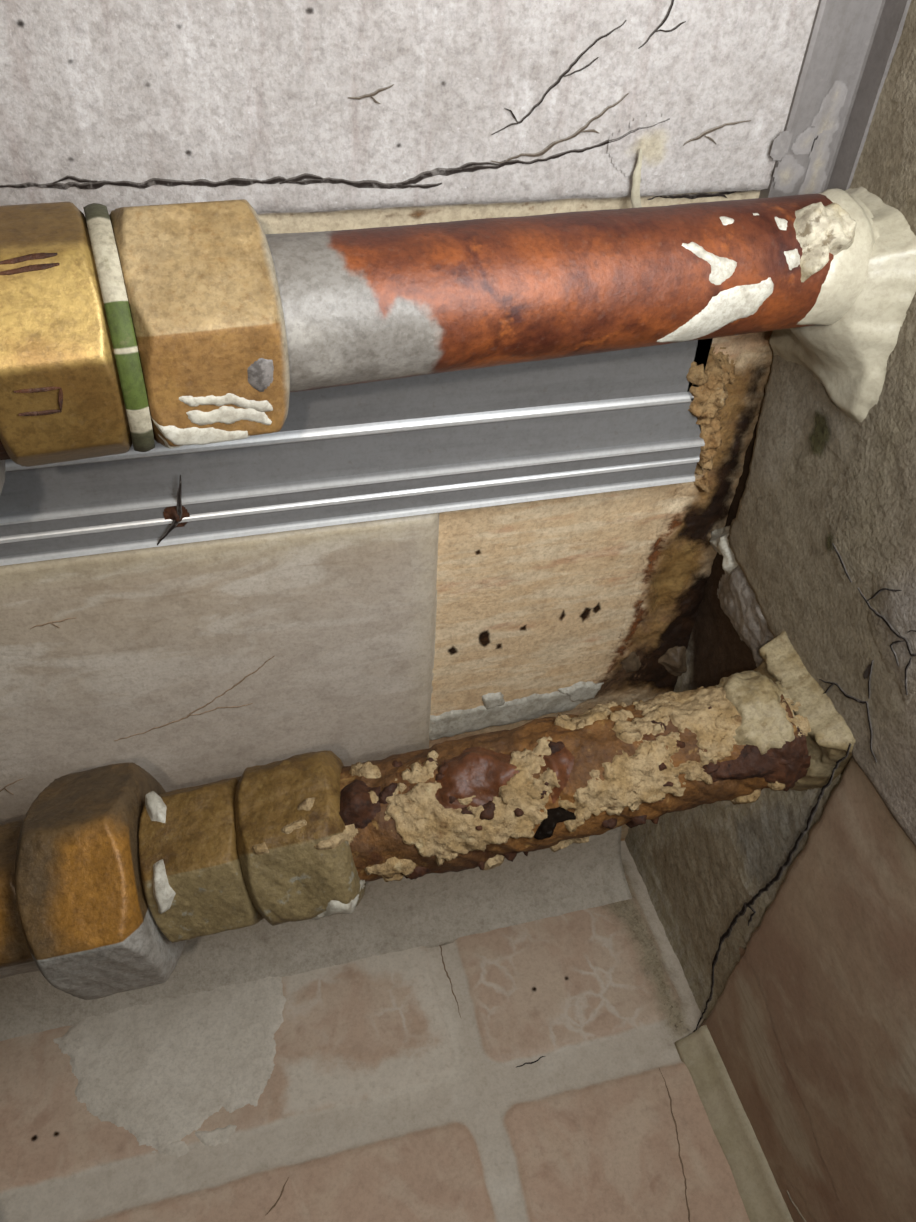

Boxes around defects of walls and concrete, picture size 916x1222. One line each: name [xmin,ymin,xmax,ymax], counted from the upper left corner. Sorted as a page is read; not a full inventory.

crack [0,0,751,190]
crack [648,191,744,200]
damp [580,346,773,704]
flaking render [709,526,774,667]
crack [694,543,916,1032]
crack [659,1068,690,1222]